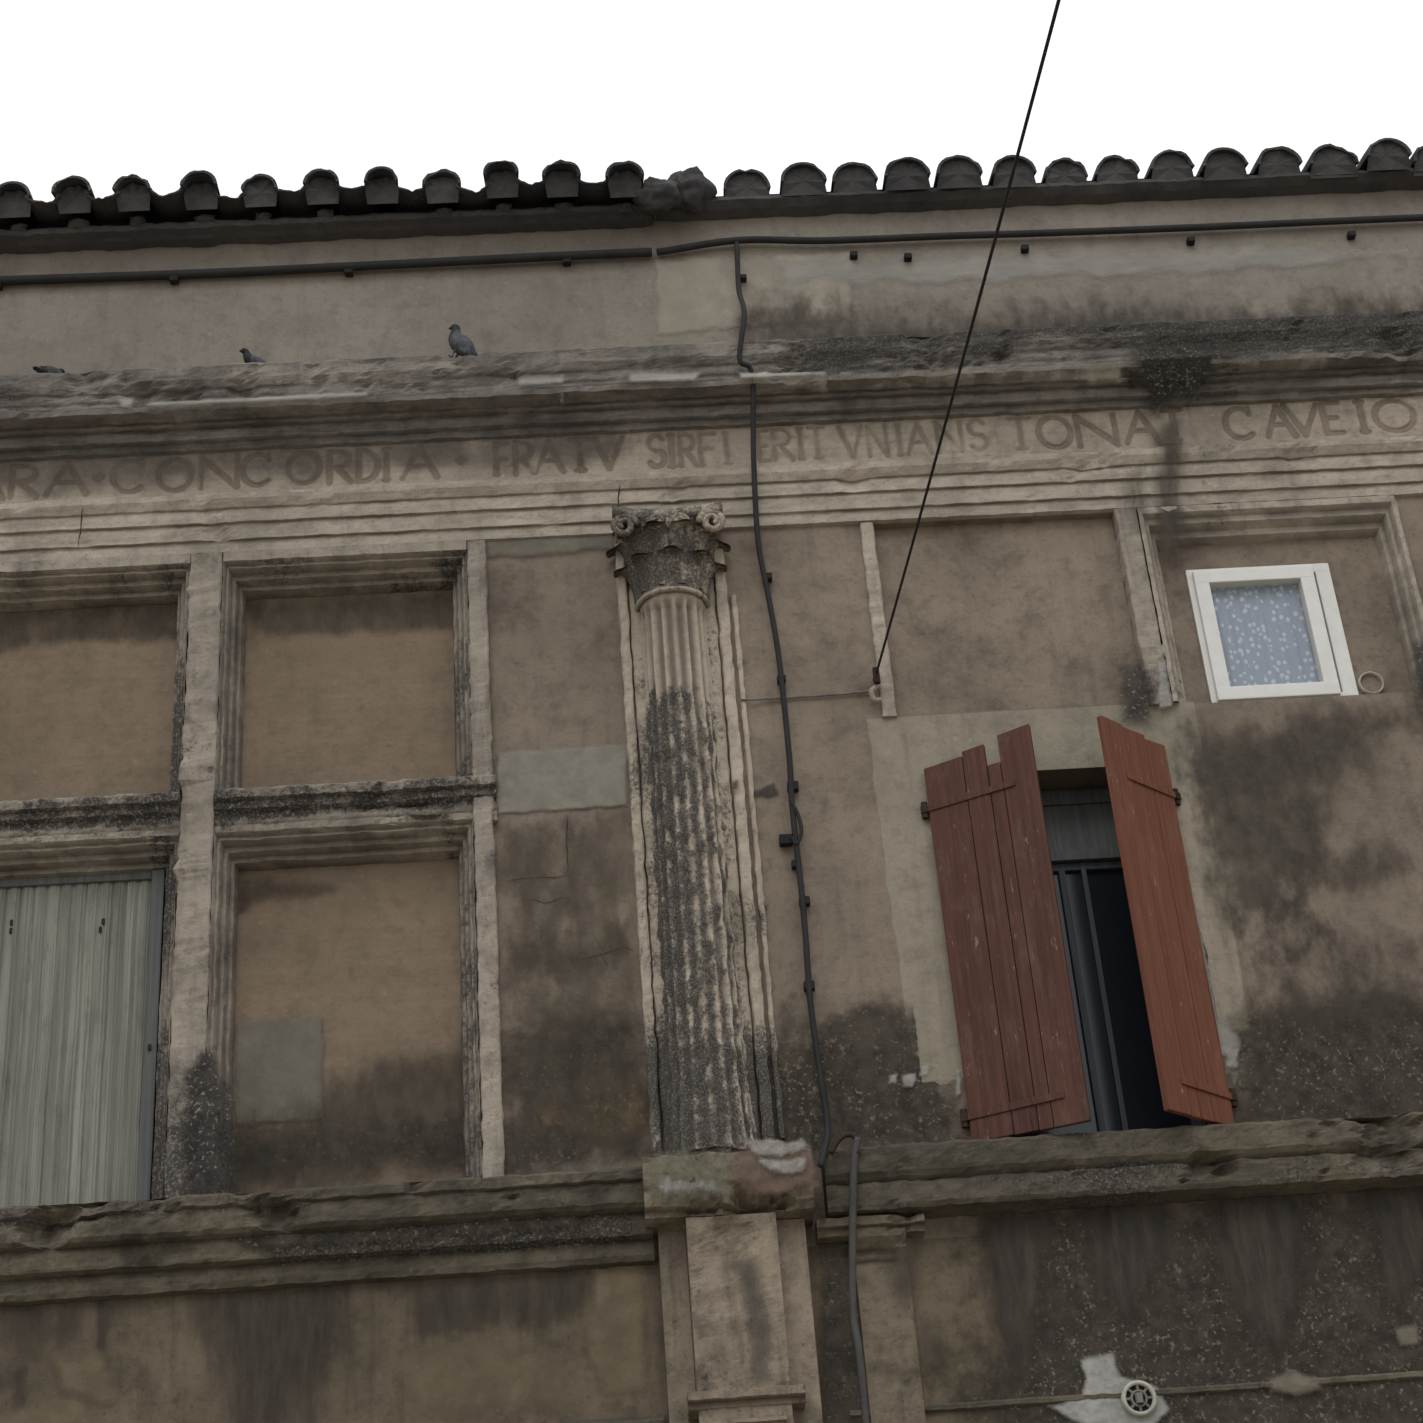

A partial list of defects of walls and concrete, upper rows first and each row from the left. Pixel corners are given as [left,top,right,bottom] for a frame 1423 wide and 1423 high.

water stain [739,303,1218,340]
water stain [1188,711,1399,929]
water stain [232,1056,481,1188]
water stain [752,1005,962,1160]
water stain [1224,949,1423,1123]
water stain [200,1291,328,1423]